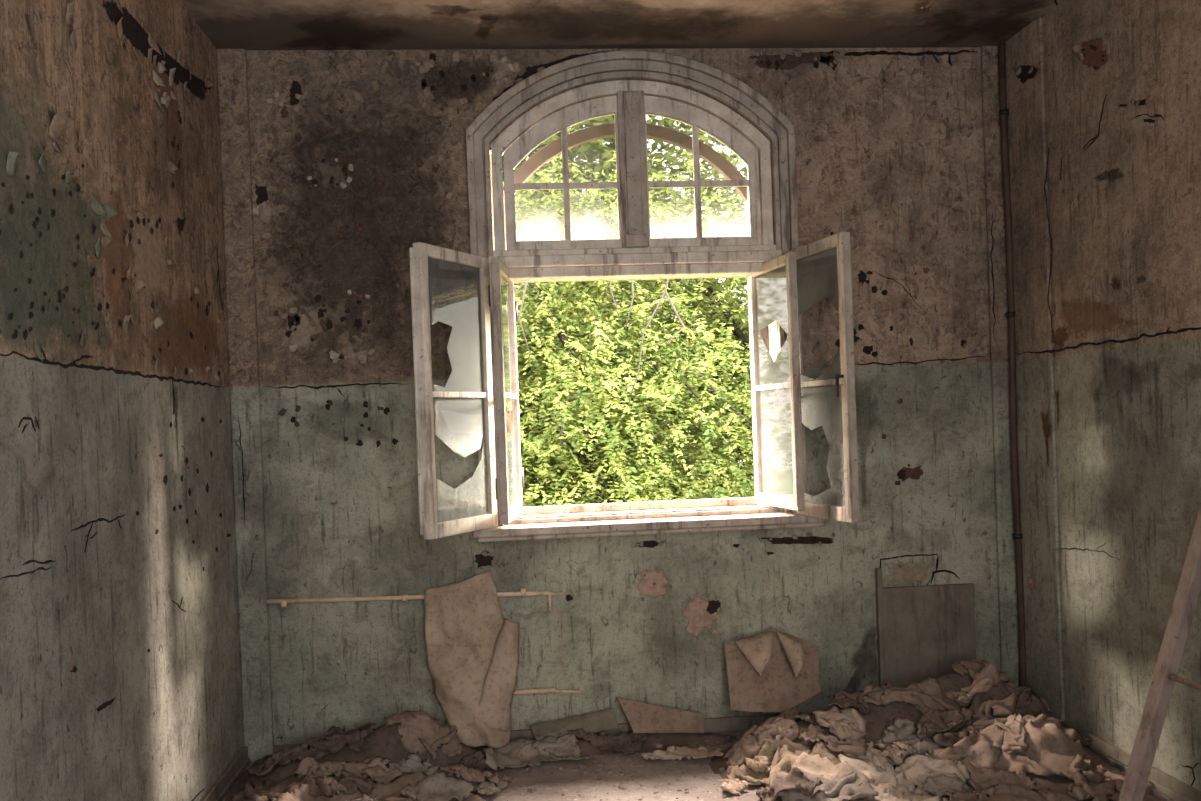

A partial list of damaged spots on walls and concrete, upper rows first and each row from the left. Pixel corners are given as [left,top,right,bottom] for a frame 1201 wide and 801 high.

peeling [1072,38,1114,70]
crack [855,94,1201,365]
crack [0,348,221,415]
crack [18,416,40,433]
spalling [895,464,923,485]
spalling [680,593,721,637]